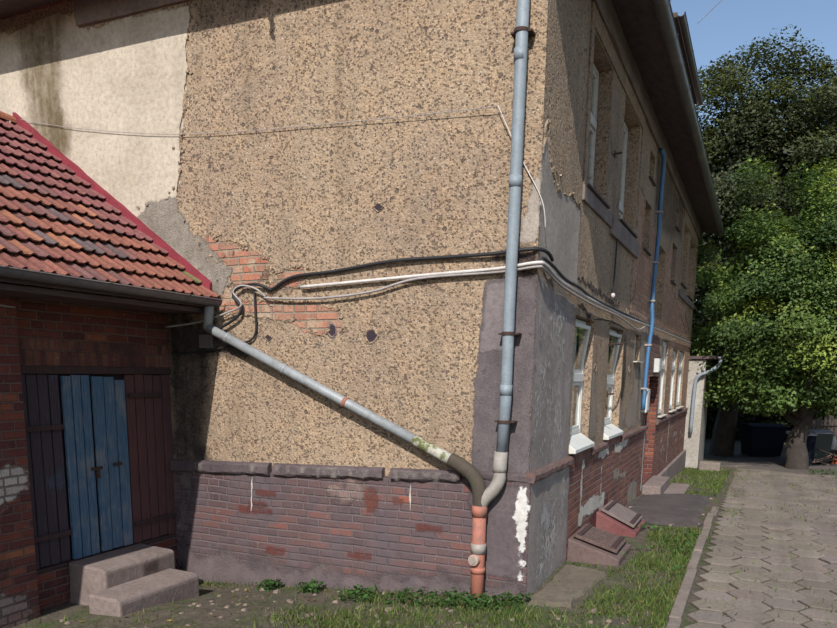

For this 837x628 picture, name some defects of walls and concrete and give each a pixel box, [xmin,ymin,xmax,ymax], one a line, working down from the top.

water stain [20,19,67,154]
spalling [137,186,349,339]
spalling [578,186,690,527]
peeling [512,476,568,593]